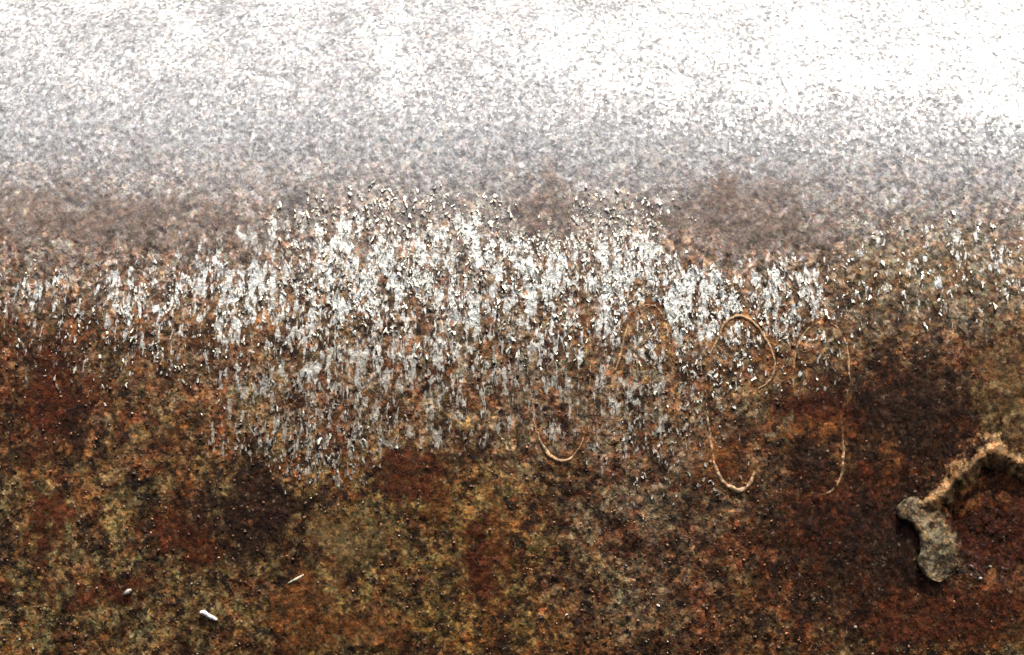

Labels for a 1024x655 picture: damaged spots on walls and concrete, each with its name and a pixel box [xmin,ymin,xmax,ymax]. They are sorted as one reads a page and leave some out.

corrosion [20,486,75,565]
corrosion [10,345,99,470]
corrosion [38,572,151,614]
corrosion [150,448,413,653]
corrosion [359,420,452,534]
corrosion [451,485,528,612]
corrosion [693,429,745,480]
corrosion [770,339,1024,653]
spalling [896,429,1024,584]